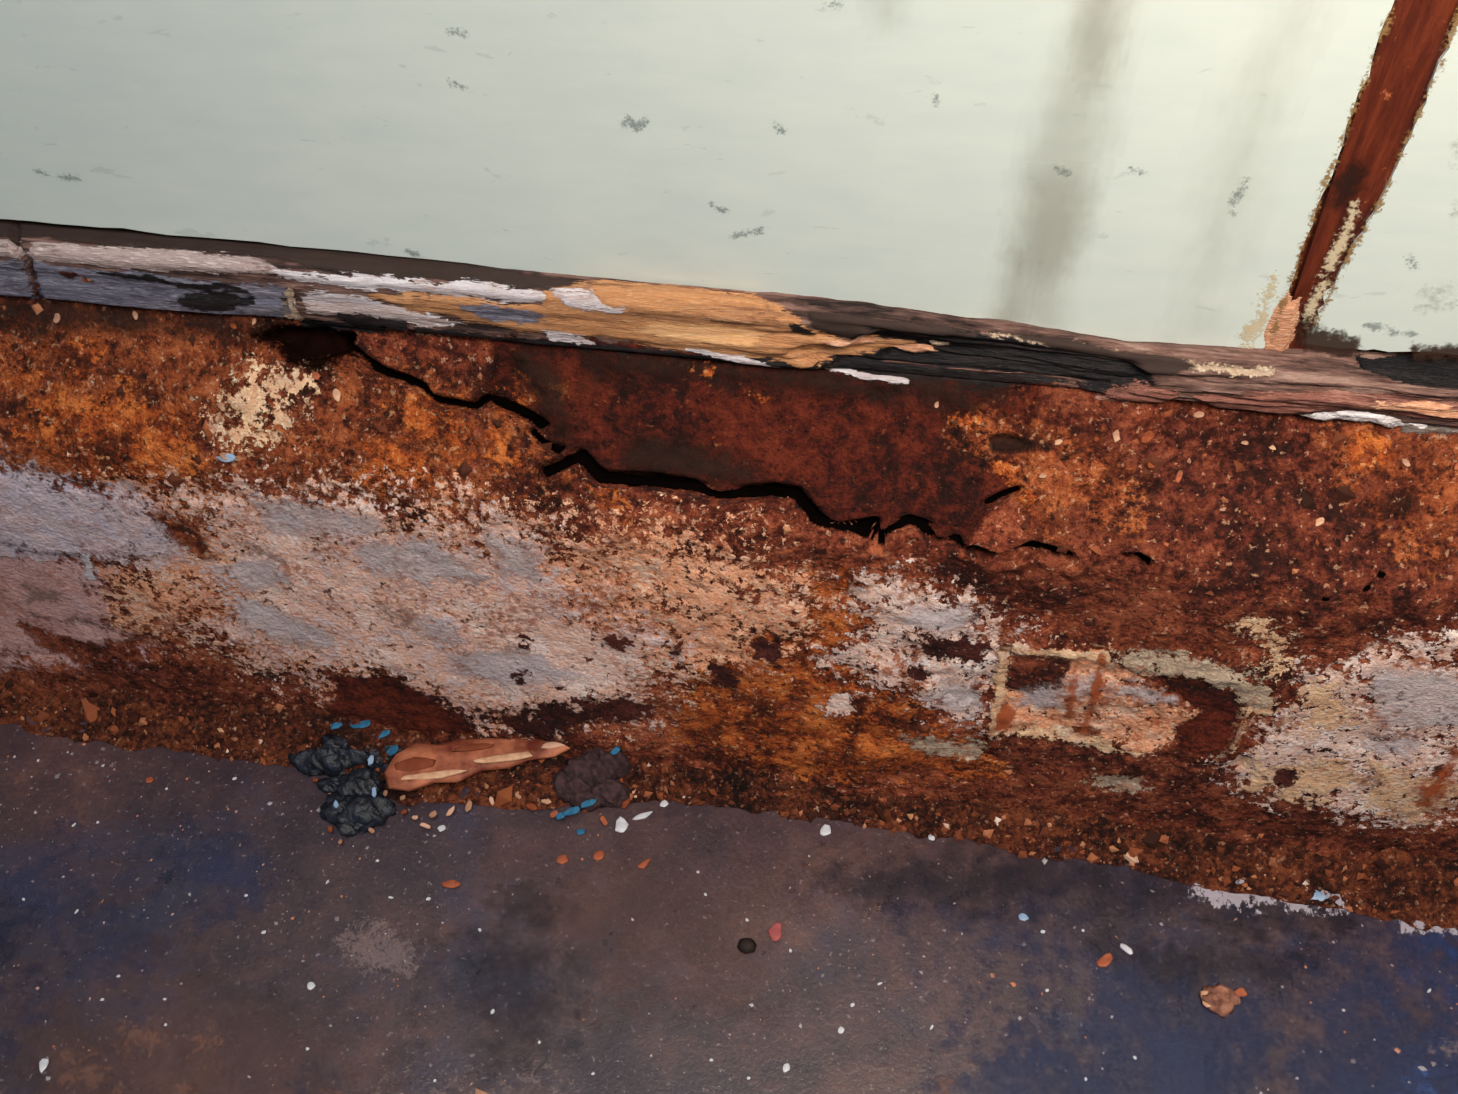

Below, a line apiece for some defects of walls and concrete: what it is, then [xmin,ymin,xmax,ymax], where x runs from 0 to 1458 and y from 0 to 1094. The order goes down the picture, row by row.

corrosion [0,619,352,714]
corrosion [0,285,642,563]
corrosion [404,686,481,743]
corrosion [525,798,558,818]
crack [350,343,1073,555]
peeling [0,333,1458,835]
corrosion [661,561,1458,862]
crack [1128,552,1151,565]
corrosion [934,373,1458,663]